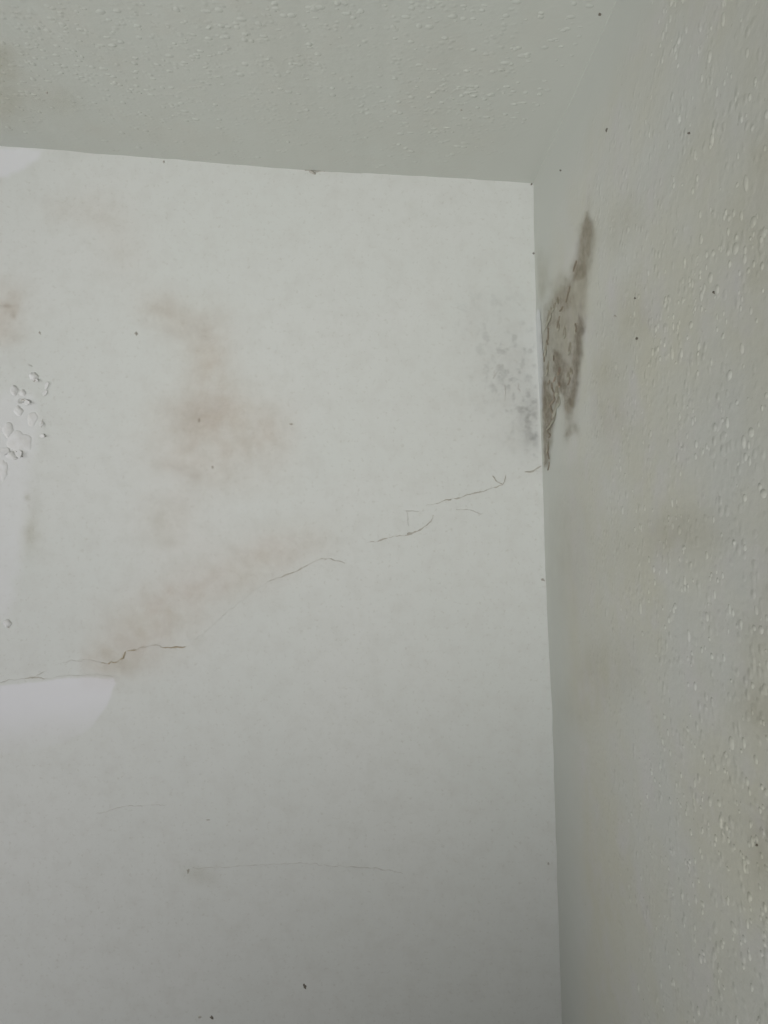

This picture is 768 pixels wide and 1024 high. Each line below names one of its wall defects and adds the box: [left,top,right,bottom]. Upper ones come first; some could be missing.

crack [371,466,543,542]
crack [0,558,344,683]